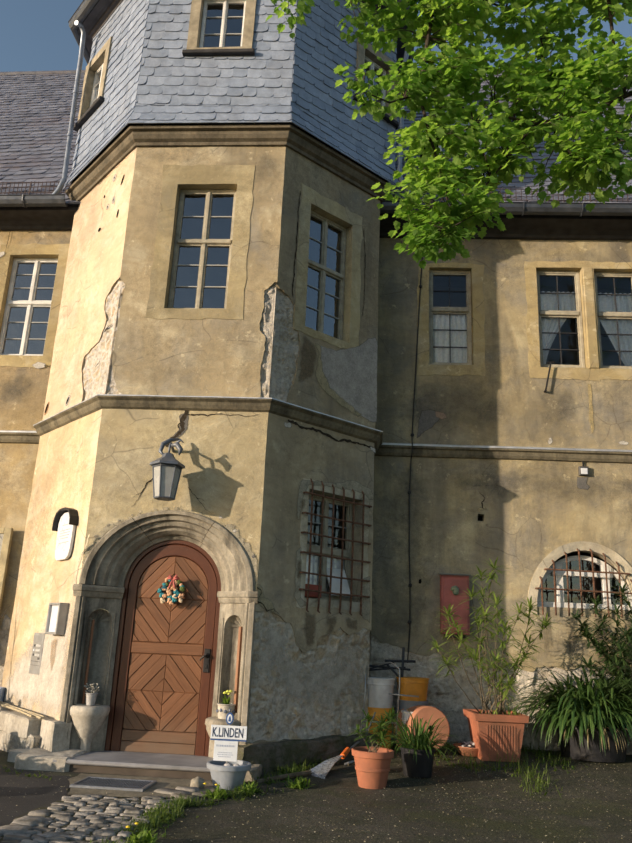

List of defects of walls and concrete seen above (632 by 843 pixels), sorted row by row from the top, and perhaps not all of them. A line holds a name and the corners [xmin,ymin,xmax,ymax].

flaking render [83,280,126,400]
flaking render [260,283,299,402]
crack [166,410,258,447]
crack [284,419,375,452]
flaking render [82,513,141,564]
flaking render [0,614,11,686]
flaking render [151,507,631,751]